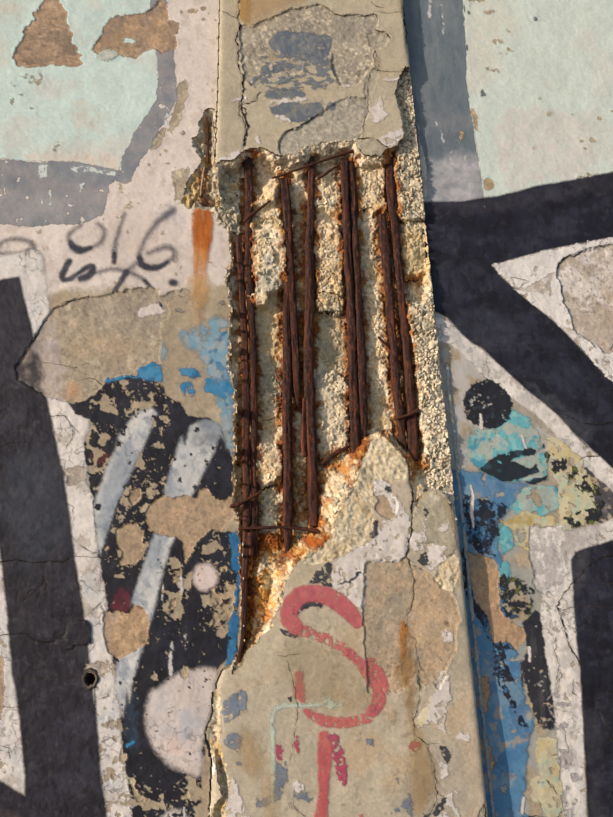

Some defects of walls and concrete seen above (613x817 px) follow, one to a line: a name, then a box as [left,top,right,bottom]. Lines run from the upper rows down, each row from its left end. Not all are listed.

peeling [13,0,83,85]
crack [223,0,408,147]
spalling [93,0,458,672]
rust [231,148,372,664]
rust [373,147,430,481]
peeling [557,245,613,354]
peeling [84,604,150,675]
crack [401,460,447,816]
peeling [363,551,526,693]
peeling [529,525,568,597]
crack [554,554,613,740]
peeling [112,773,147,803]